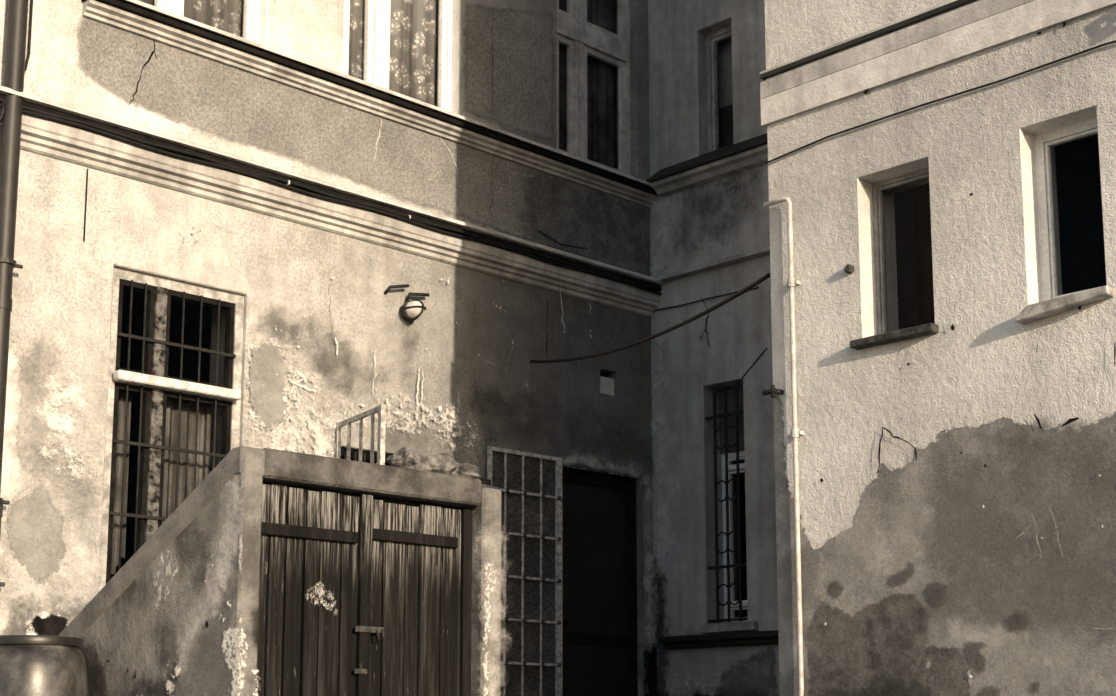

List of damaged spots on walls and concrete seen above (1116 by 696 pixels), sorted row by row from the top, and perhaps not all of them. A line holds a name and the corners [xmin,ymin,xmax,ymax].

crack [129,40,158,105]
water stain [266,310,313,338]
water stain [318,335,353,390]
water stain [248,376,558,457]
flaking render [0,327,105,636]
water stain [610,344,684,696]
peeling [773,393,1116,696]
water stain [807,424,1116,696]
spalling [166,665,181,694]
spalling [205,601,260,696]
water stain [482,536,504,696]
water stain [694,647,777,696]